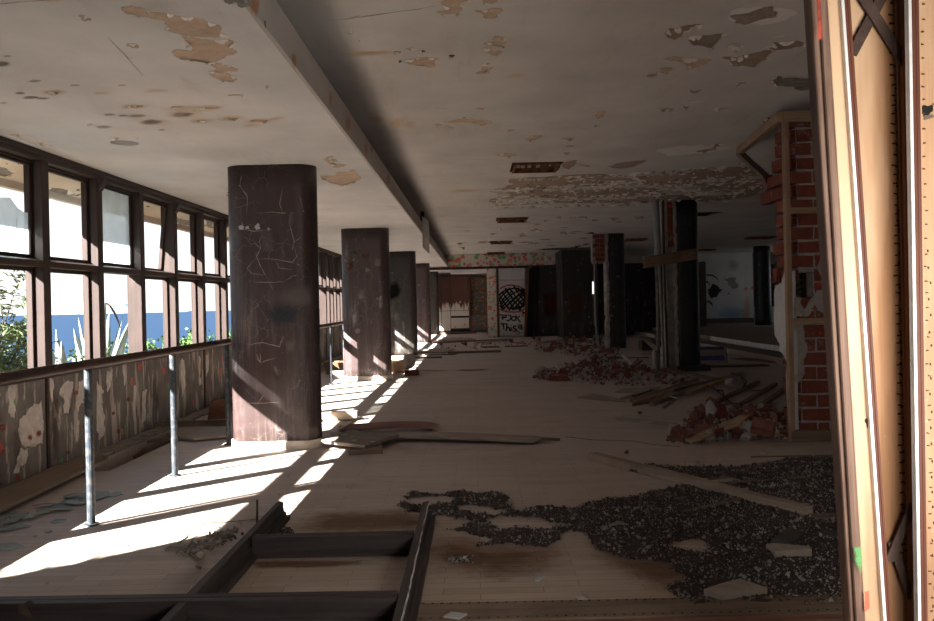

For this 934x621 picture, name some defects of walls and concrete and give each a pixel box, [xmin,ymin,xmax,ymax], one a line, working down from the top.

spalling [224,0,251,8]
peeling [437,0,503,19]
peeling [121,5,238,82]
peeling [647,24,806,78]
peeling [319,156,361,186]
peeling [489,137,764,265]
crack [234,175,303,289]